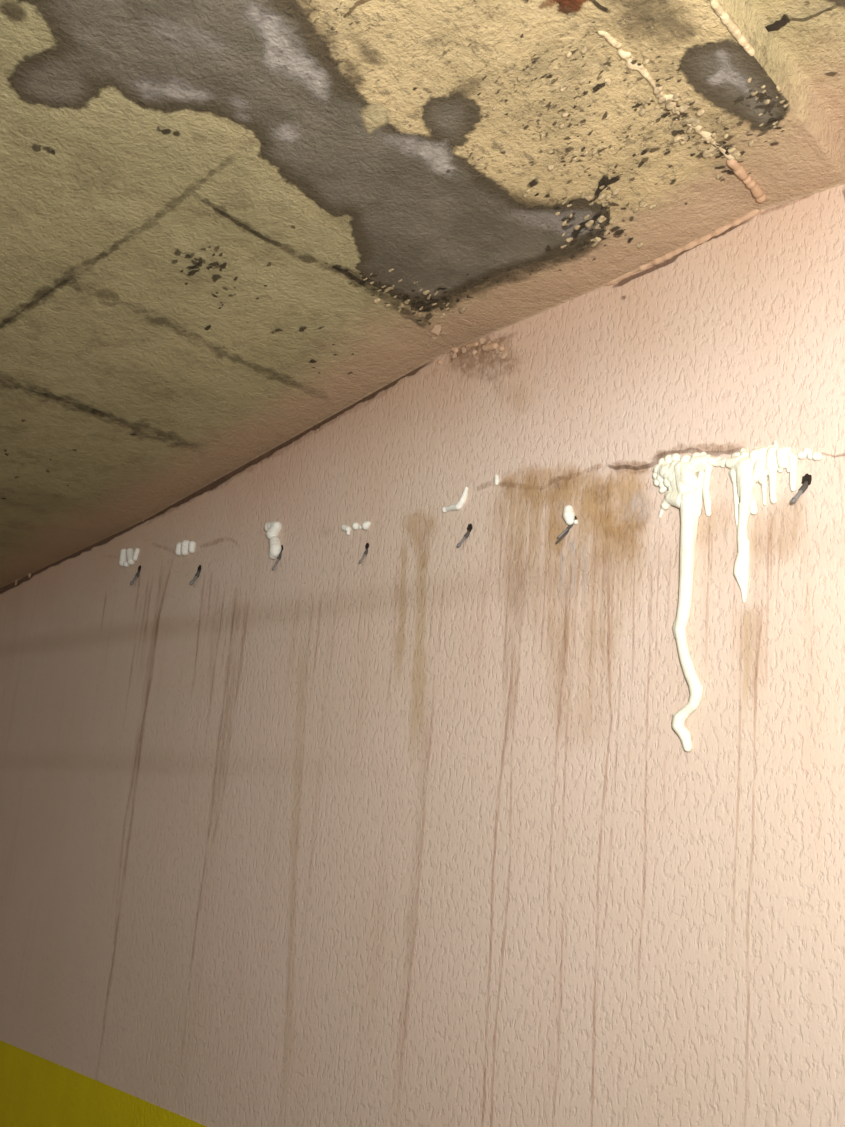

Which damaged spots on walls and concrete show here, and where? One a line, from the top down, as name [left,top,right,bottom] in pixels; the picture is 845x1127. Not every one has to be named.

rust [526,0,608,13]
damp [679,39,789,132]
damp [2,0,609,312]